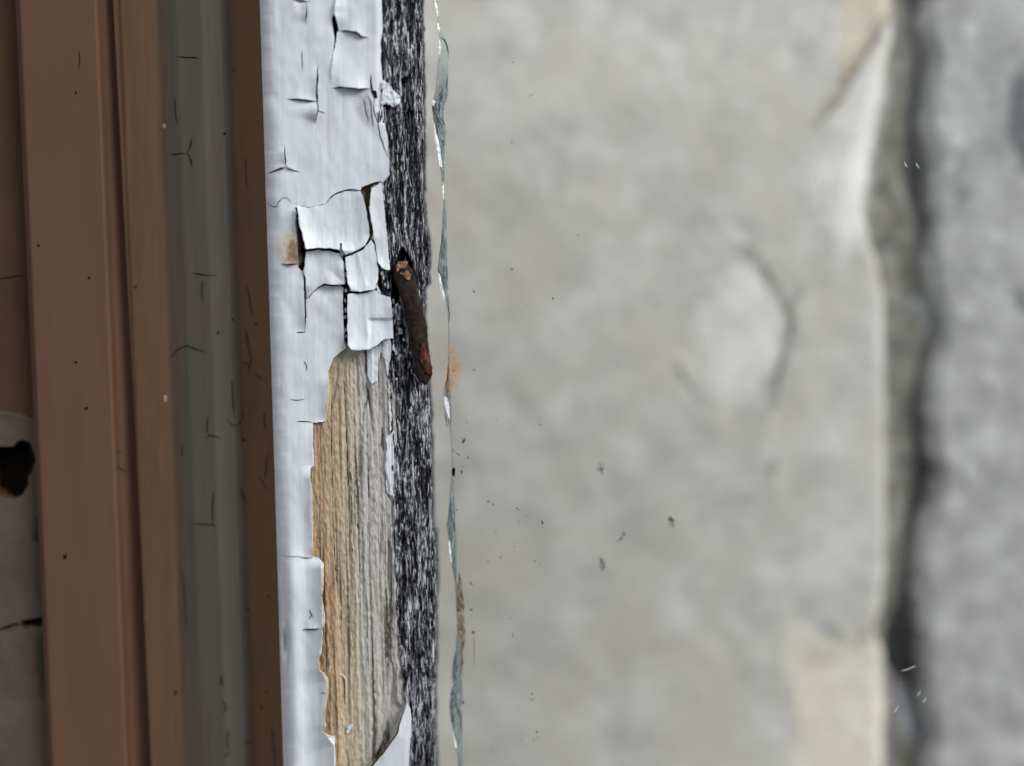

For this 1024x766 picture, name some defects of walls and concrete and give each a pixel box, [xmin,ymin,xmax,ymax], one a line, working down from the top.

crack [289,30,388,156]
crack [245,145,298,191]
crack [284,244,381,342]
rust [419,343,431,375]
peeling [296,183,412,766]